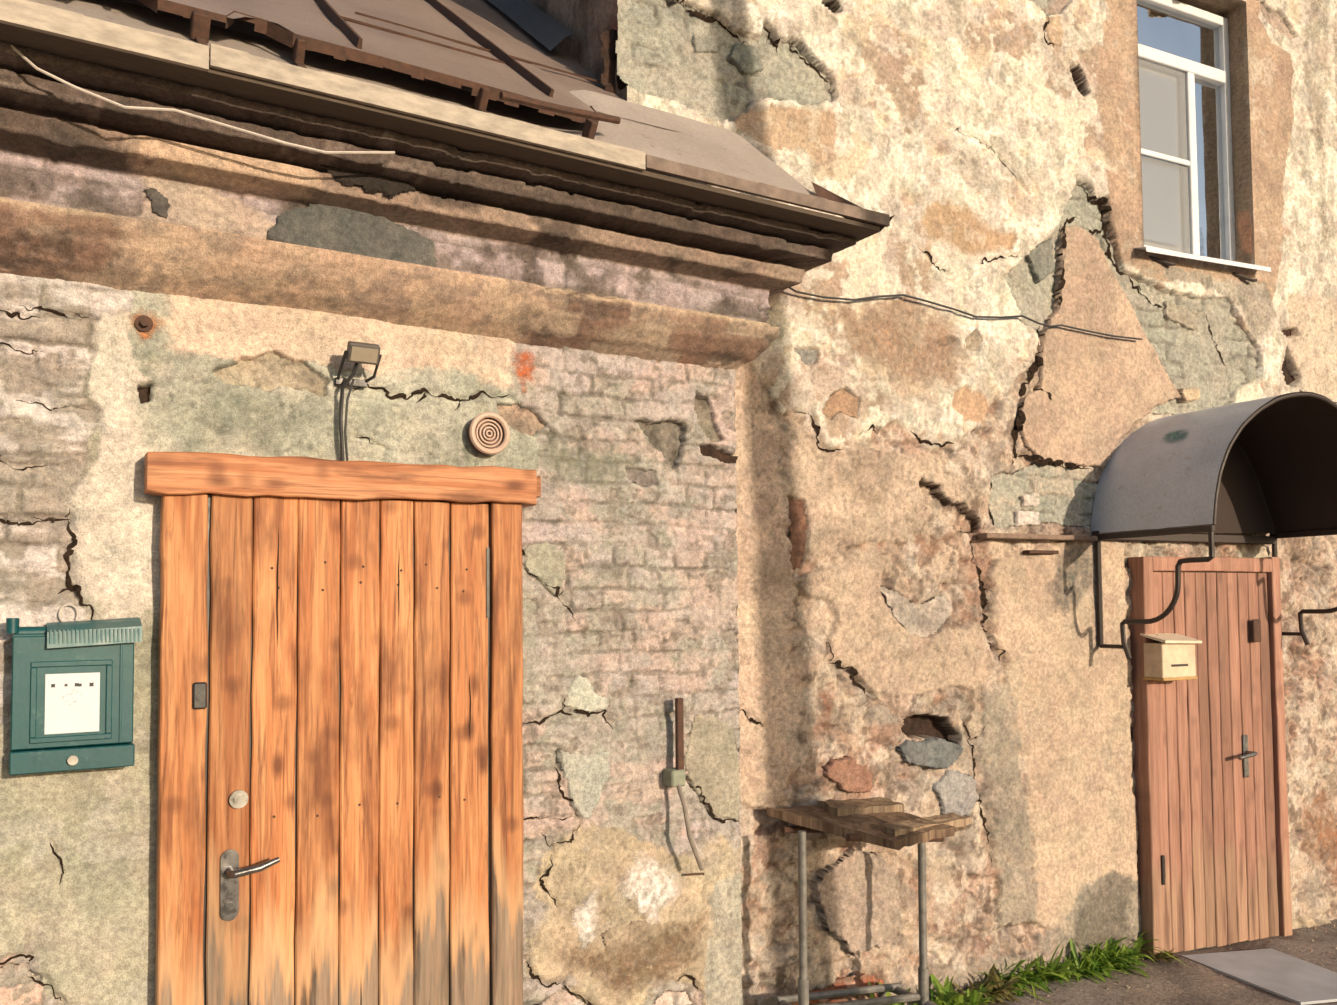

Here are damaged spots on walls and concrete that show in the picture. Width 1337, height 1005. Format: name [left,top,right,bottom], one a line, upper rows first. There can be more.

spalling [601,0,832,122]
crack [0,305,93,355]
peeling [989,185,1258,528]
crack [347,384,532,413]
spalling [693,396,738,464]
crack [0,511,94,620]
spalling [787,496,807,570]
spalling [919,486,971,533]
peeling [565,675,609,713]
peeling [684,714,740,821]
spalling [0,962,43,1005]
crack [0,954,62,1001]